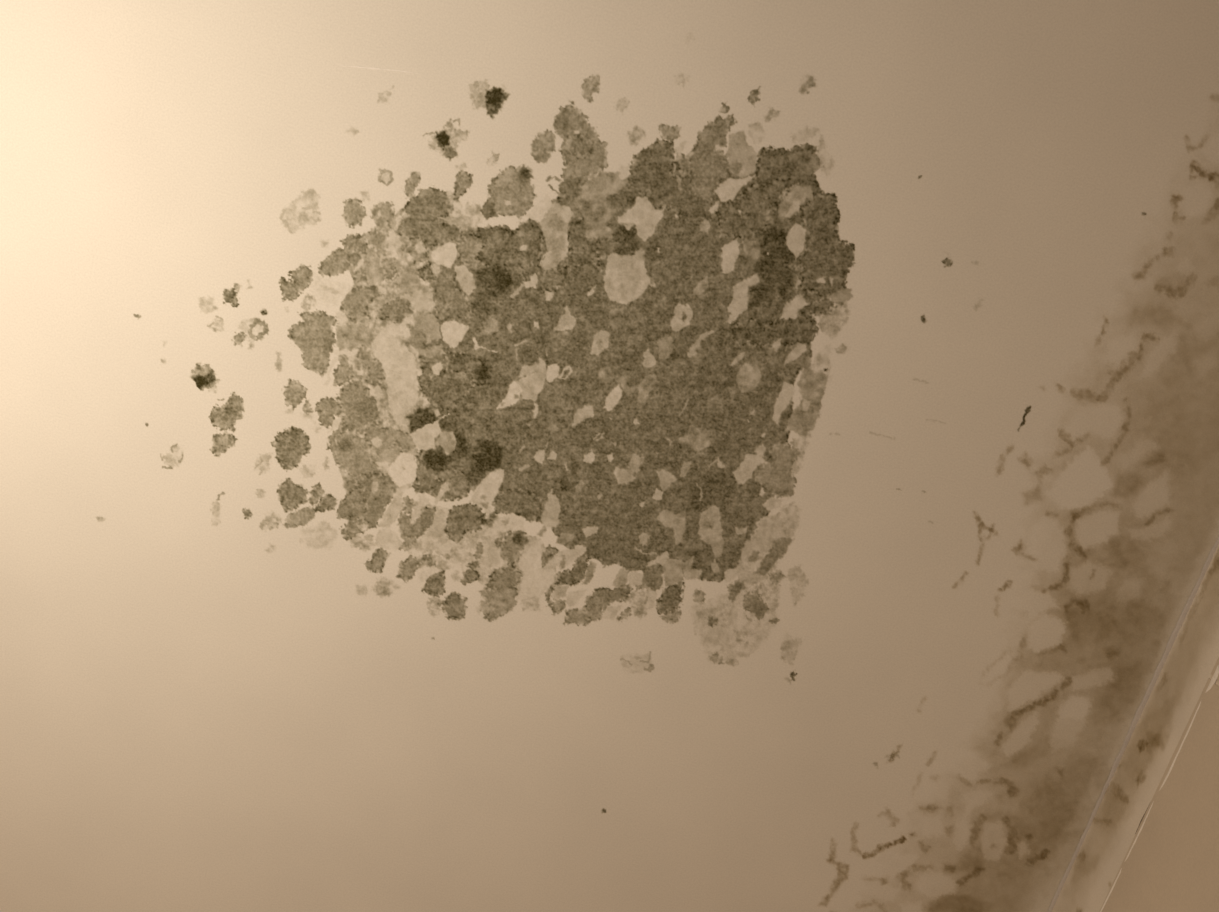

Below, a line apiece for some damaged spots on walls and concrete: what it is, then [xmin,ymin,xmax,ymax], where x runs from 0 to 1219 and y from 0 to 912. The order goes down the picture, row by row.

mould [485,87,507,117]
mould [193,364,215,390]
water stain [305,107,855,622]
water stain [211,394,237,456]
mould [272,426,390,540]